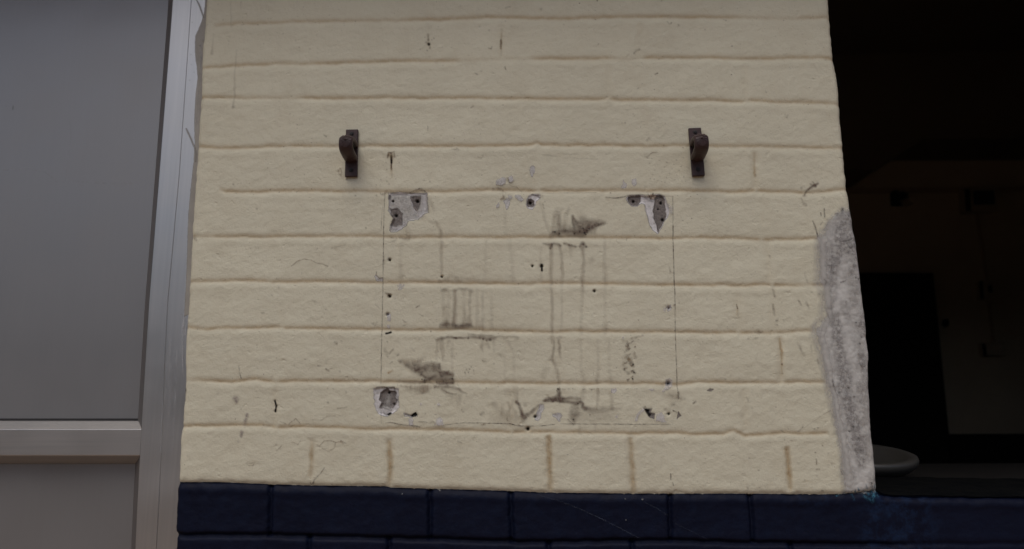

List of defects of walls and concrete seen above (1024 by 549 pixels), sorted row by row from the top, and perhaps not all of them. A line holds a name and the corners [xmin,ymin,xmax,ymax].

spalling [388,188,428,232]
spalling [626,194,672,234]
spalling [373,387,417,425]